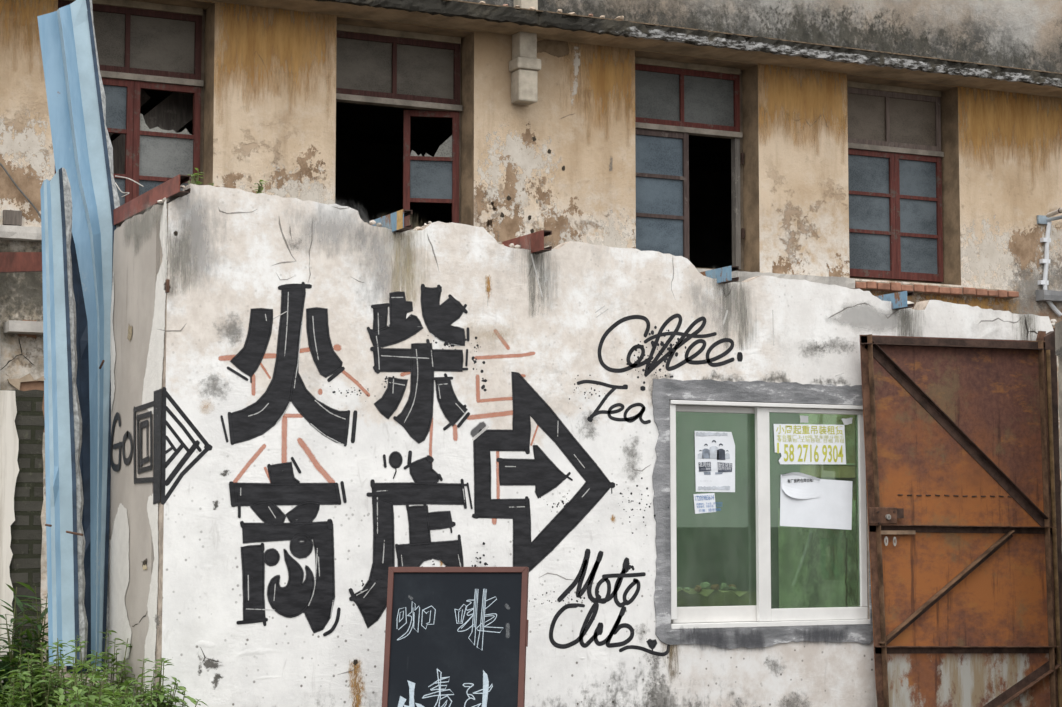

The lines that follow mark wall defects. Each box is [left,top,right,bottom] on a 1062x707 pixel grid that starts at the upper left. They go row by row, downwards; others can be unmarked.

leakage [214,3,336,95]
leakage [758,64,847,134]
leakage [955,86,1062,157]
peeling [0,113,55,224]
peeling [474,123,636,249]
leakage [529,250,548,311]
peeling [772,256,805,275]
peeling [827,216,1062,330]
leakage [899,264,1062,339]
leakage [687,631,763,649]